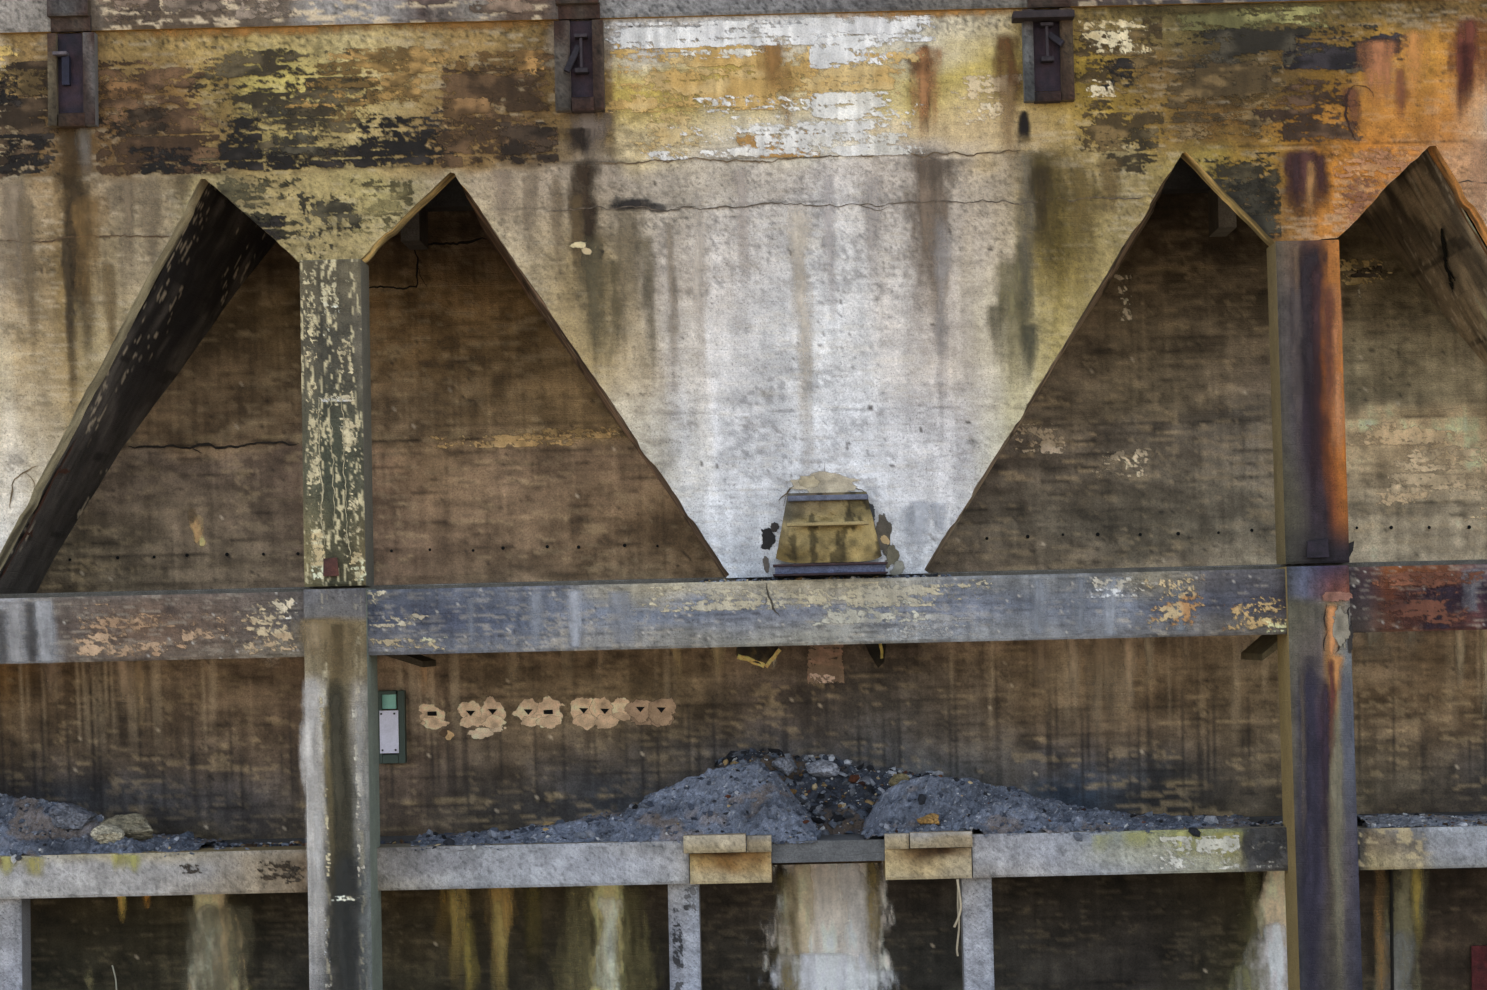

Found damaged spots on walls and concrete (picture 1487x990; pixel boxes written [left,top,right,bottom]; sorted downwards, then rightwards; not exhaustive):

peeling [0,45,60,179]
peeling [604,15,936,161]
rust [1450,19,1480,104]
damp [59,128,116,373]
peeling [95,46,559,580]
damp [913,154,954,347]
rust [1293,247,1342,443]
crack [1440,180,1487,292]
peeling [73,598,298,657]
rust [1372,571,1485,630]
damp [440,889,474,982]
damp [563,885,649,990]